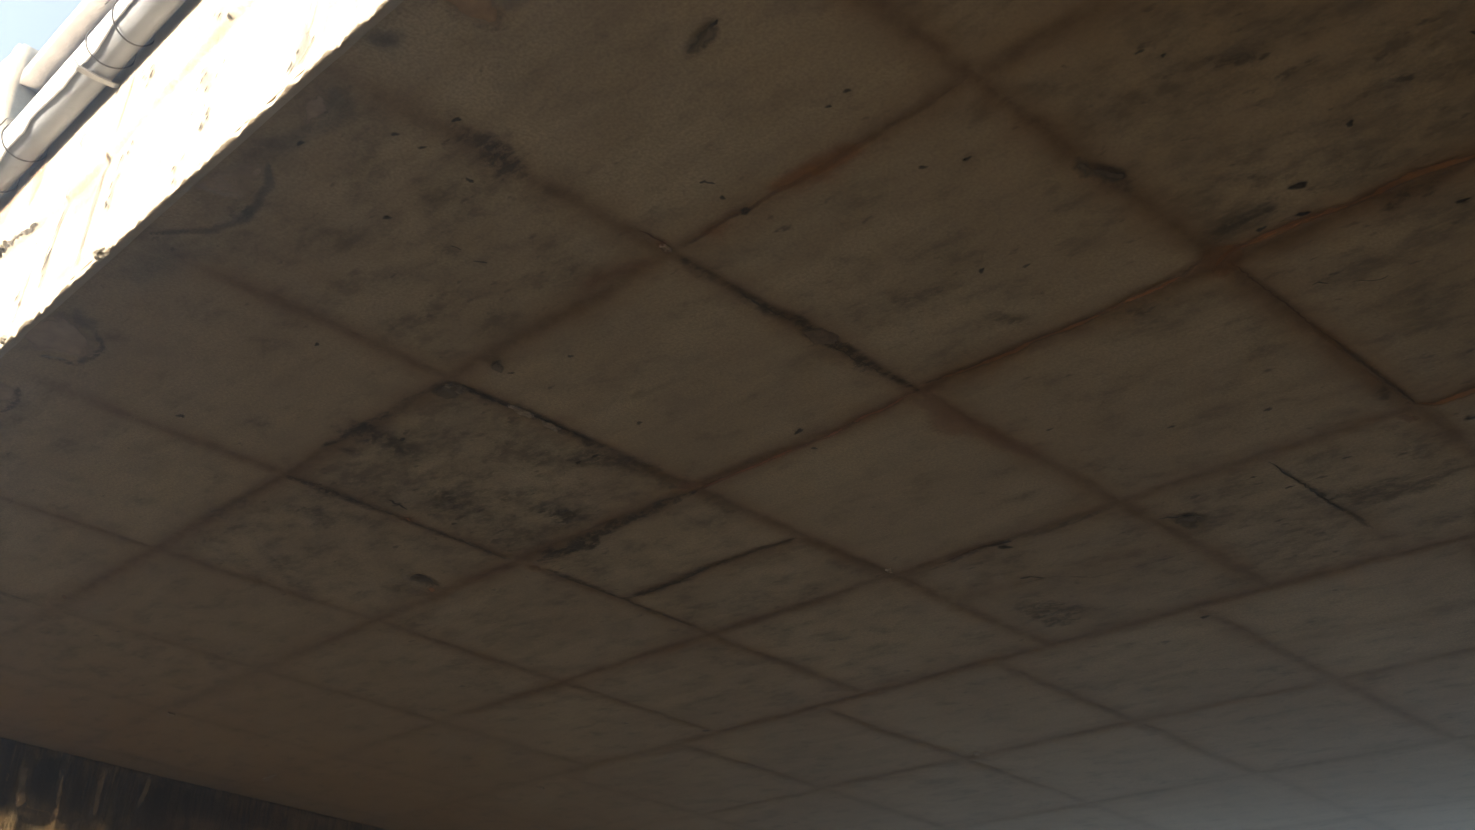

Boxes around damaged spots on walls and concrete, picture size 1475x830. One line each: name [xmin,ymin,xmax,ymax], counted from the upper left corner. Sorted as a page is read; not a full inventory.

crack [1269,462,1365,524]